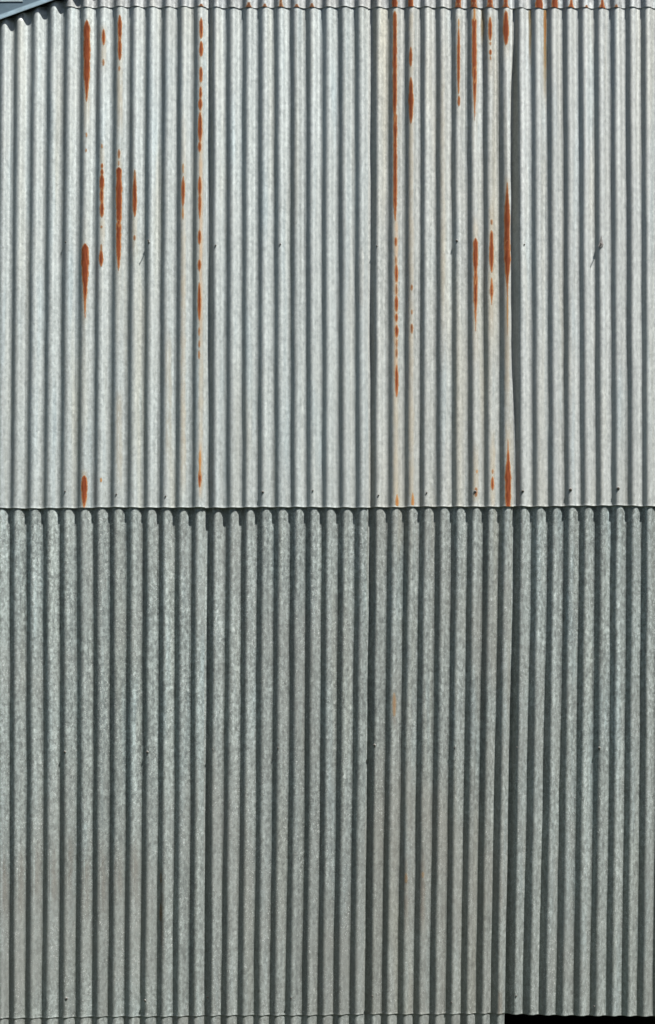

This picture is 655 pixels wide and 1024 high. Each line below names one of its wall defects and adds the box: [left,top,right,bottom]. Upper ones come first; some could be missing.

rust [83,15,122,102]
rust [392,0,414,221]
rust [454,0,510,117]
rust [81,243,104,317]
rust [100,150,137,271]
rust [394,237,413,397]
rust [473,183,511,331]
rust [81,475,102,508]
rust [491,442,512,506]